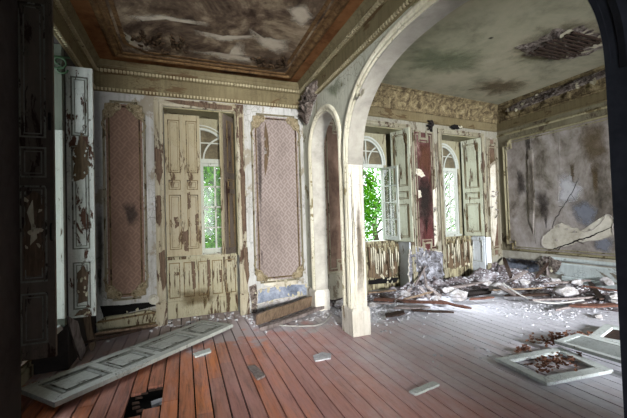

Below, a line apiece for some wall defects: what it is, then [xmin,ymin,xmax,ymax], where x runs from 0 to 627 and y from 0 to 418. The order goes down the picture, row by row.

damp [480,81,519,92]
flaking render [504,70,605,112]
peeling [27,200,37,245]
peeling [72,133,91,181]
peeling [155,149,163,185]
peeling [174,217,189,252]
flaking render [244,247,308,313]
peeling [367,247,399,284]
damp [419,147,434,254]
peeling [506,214,614,276]
crack [552,145,579,227]
flaking render [100,302,156,317]